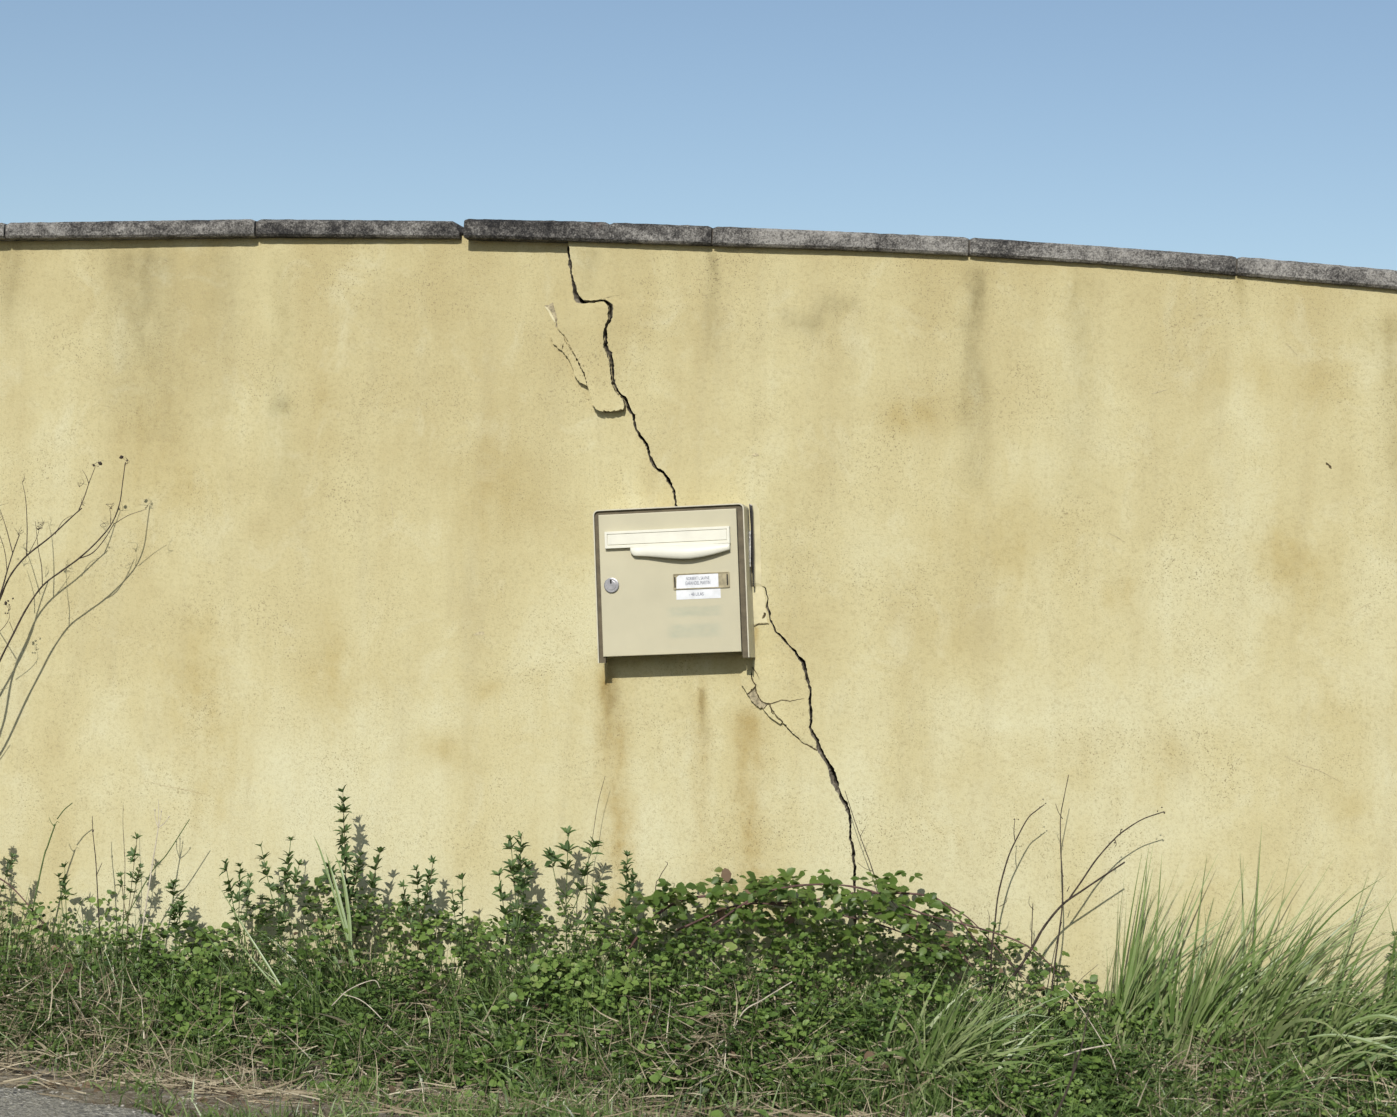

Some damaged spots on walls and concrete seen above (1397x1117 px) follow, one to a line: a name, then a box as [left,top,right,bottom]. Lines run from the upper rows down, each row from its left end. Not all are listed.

flaking render [544,298,626,413]
crack [567,245,678,506]
flaking render [740,652,816,749]
crack [754,587,857,997]